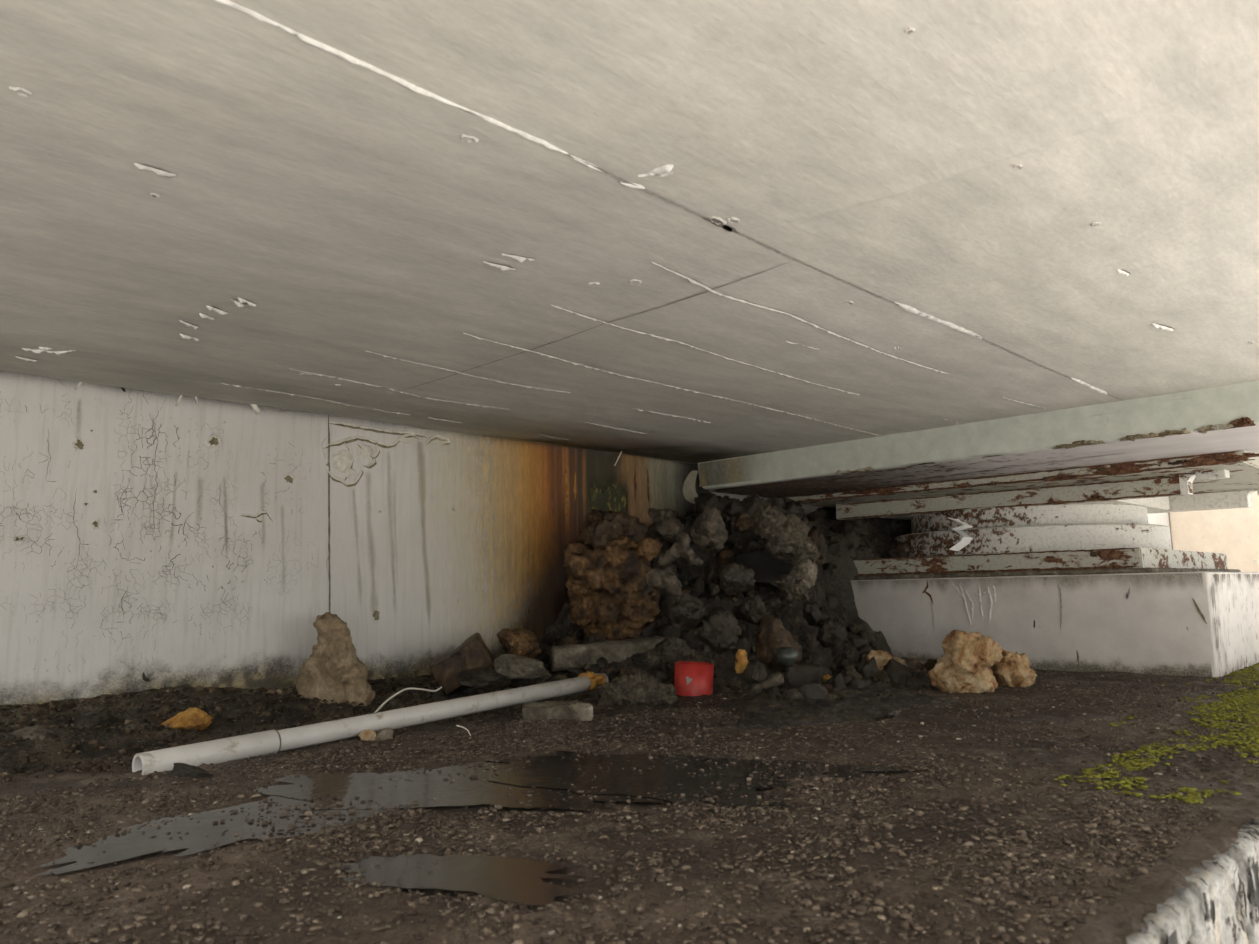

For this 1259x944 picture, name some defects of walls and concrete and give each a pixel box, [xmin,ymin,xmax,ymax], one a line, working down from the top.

rust [469,435,1259,642]